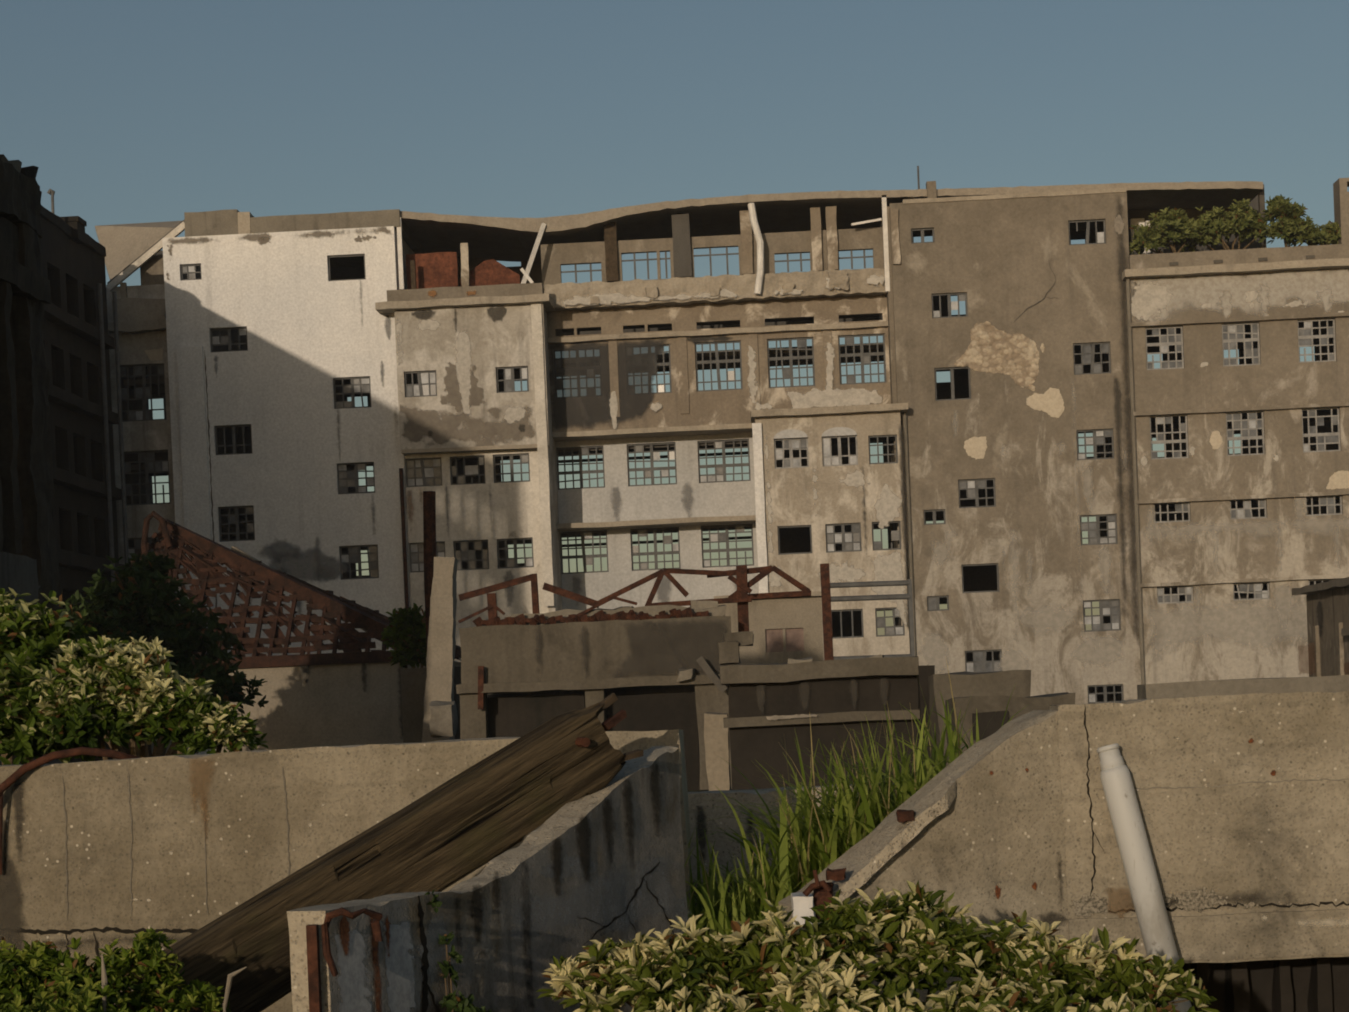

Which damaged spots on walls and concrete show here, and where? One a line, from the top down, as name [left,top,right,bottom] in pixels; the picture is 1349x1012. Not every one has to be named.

peeling [418,319,440,331]
peeling [400,331,535,446]
peeling [562,289,737,305]
spalling [954,321,1045,391]
corrosion [473,607,709,627]
corrosion [340,916,350,955]
corrosion [370,916,390,1012]
leakage [456,872,500,954]
leakage [552,839,562,895]
leakage [577,780,634,881]
crack [577,862,675,946]
crack [1070,707,1349,913]